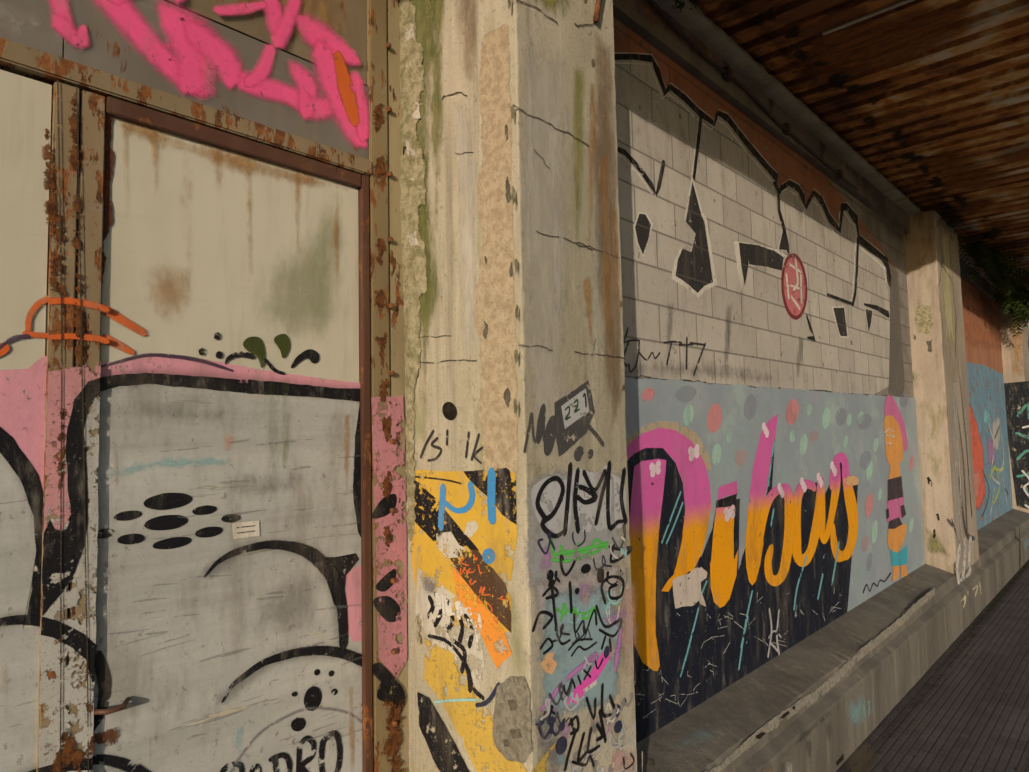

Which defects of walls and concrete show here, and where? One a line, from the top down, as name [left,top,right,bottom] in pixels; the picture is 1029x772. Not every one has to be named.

rust [68,97,81,173]
rust [128,124,161,141]
rust [210,150,257,173]
rust [42,128,86,374]
spalling [399,0,427,552]
rust [57,410,66,490]
rust [50,727,119,772]
rust [382,697,407,772]